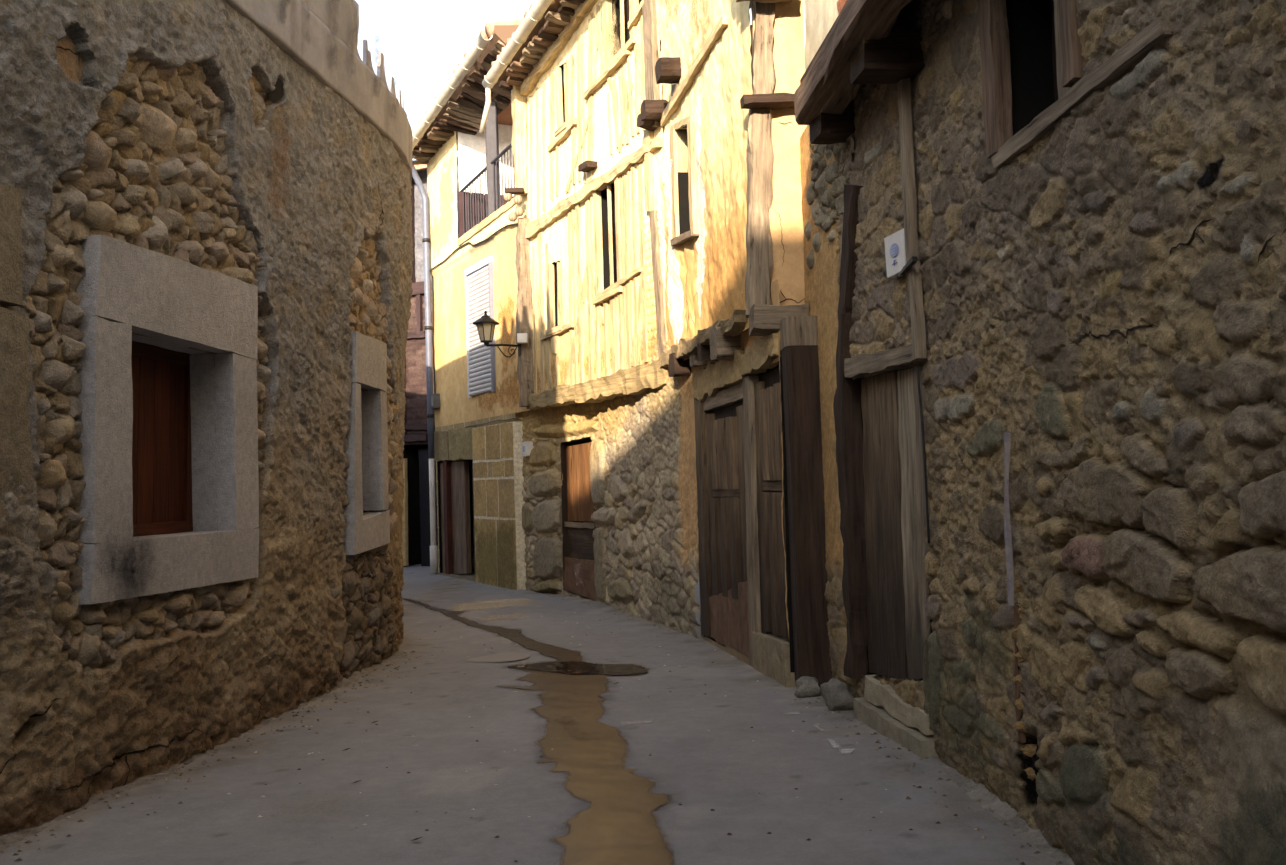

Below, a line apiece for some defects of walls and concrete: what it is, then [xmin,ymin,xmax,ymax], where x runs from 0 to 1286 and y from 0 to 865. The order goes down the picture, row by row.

peeling [56,31,84,83]
spalling [249,75,284,123]
spalling [20,55,271,679]
spalling [330,235,400,689]
crack [29,698,60,718]
crack [57,726,202,790]